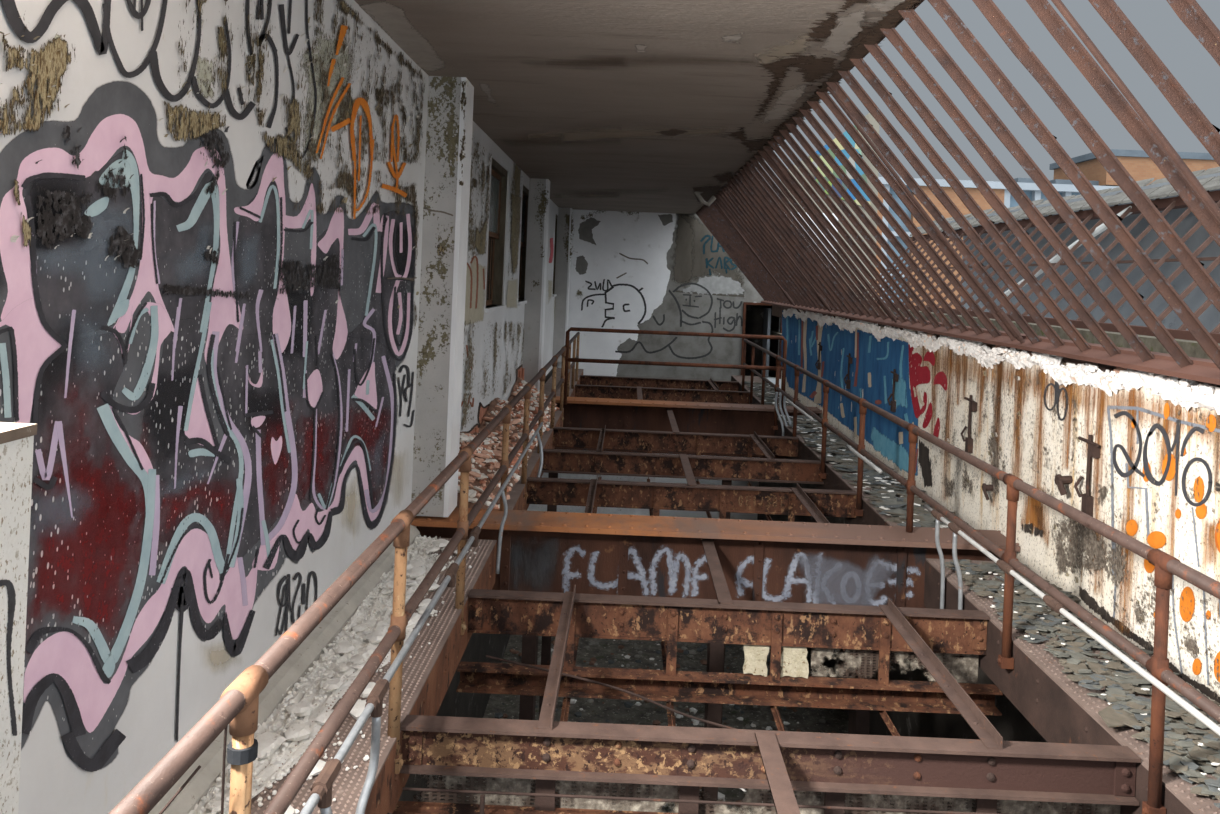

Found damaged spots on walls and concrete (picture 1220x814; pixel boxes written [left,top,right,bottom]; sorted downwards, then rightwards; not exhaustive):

peeling [0,14,75,137]
peeling [10,123,143,268]
peeling [158,0,425,277]
peeling [616,213,764,381]
rust [922,347,1220,631]